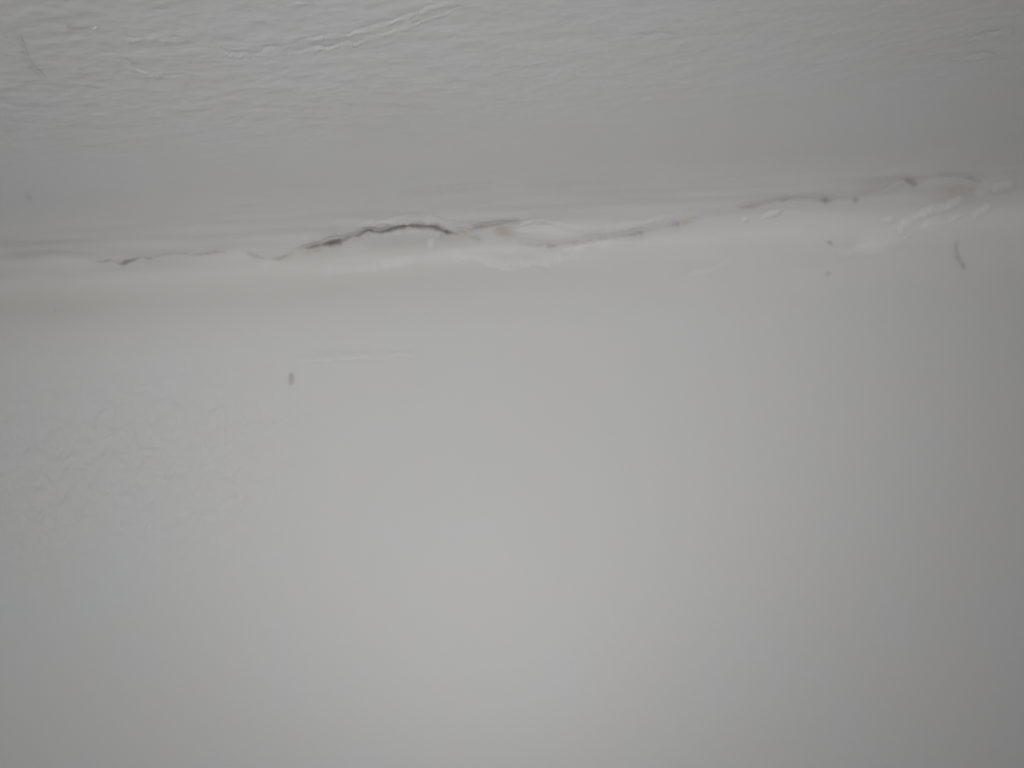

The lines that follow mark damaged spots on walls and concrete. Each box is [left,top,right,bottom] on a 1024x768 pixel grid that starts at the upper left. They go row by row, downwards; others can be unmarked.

crack [738,172,984,212]
crack [245,212,697,262]